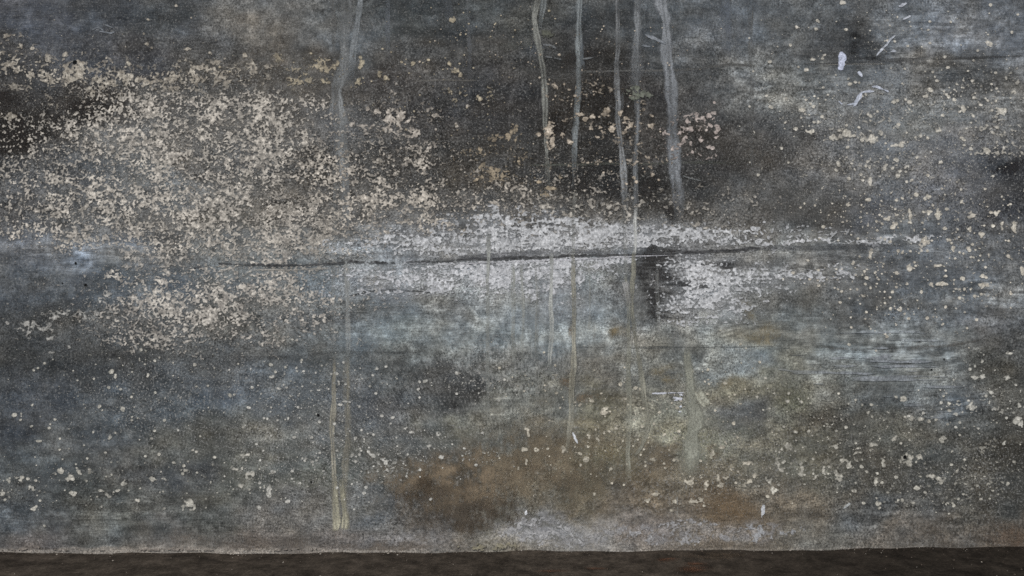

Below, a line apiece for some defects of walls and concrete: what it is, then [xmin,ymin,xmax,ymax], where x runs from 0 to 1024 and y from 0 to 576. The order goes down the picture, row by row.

leakage [532,0,683,221]
leakage [330,366,350,530]
crack [189,244,882,271]
leakage [622,211,710,470]